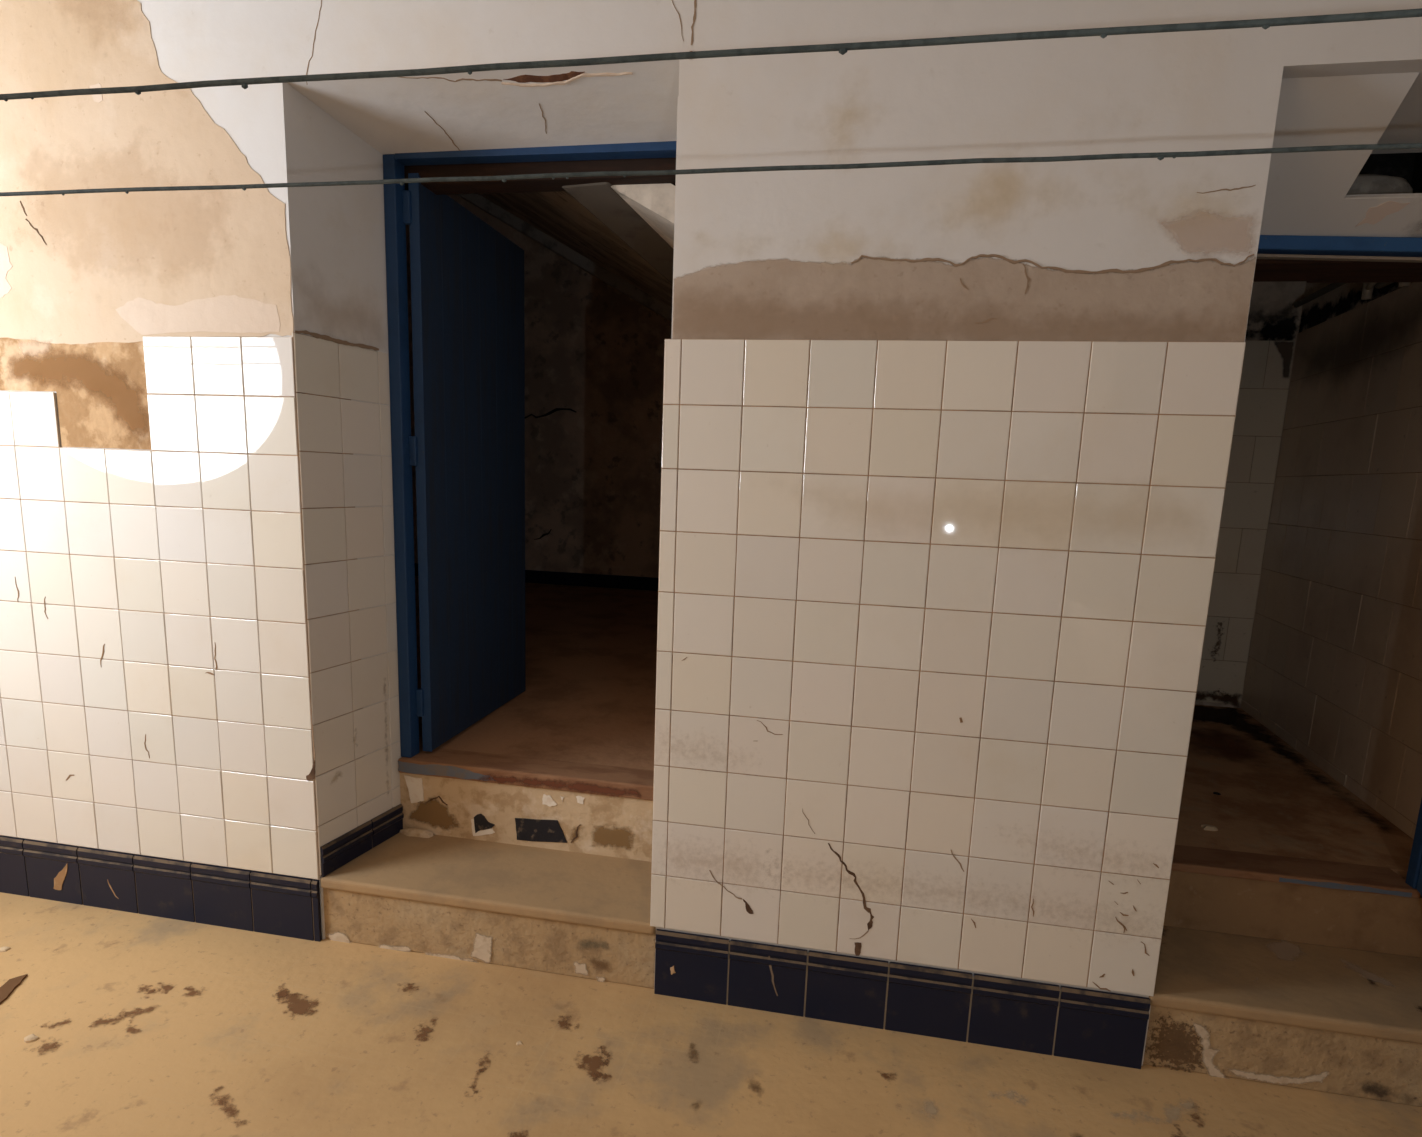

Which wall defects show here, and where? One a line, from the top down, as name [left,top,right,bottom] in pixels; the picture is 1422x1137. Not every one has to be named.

crack [672,0,696,45]
flaking render [400,71,633,87]
flaking render [0,0,294,450]
flaking render [672,254,1256,342]
water stain [1245,282,1412,378]
flaking render [398,761,495,836]
flaking render [515,794,633,849]
crack [709,870,753,914]
crack [802,809,874,956]